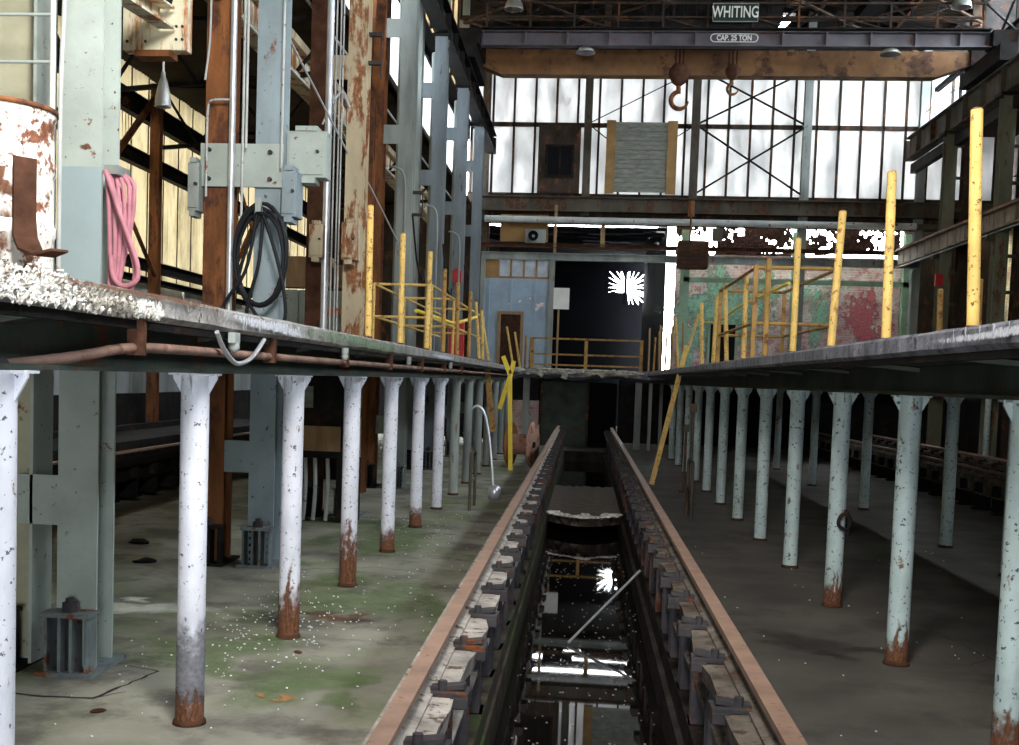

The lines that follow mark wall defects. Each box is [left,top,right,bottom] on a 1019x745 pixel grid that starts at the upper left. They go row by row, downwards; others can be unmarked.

peeling [659,264,790,367]
peeling [803,277,895,348]
corrosion [409,508,422,526]
corrosion [339,521,357,584]
corrosion [380,529,395,550]
corrosion [278,569,300,635]
corrosion [823,573,842,604]
corrosion [885,624,909,663]
corrosion [175,689,204,722]
corrosion [990,709,1019,745]